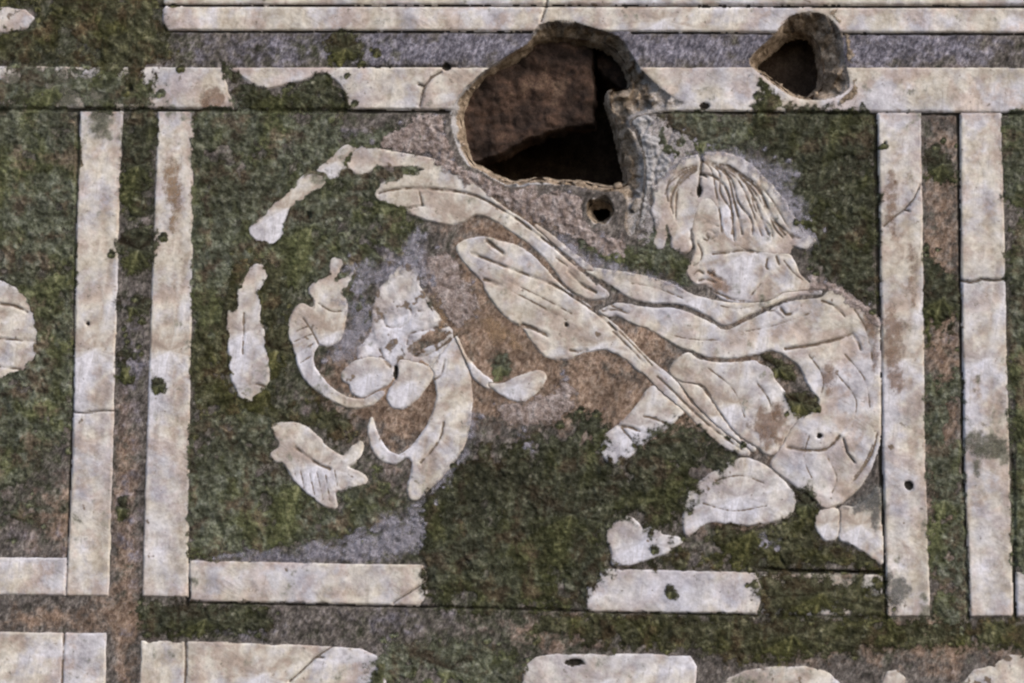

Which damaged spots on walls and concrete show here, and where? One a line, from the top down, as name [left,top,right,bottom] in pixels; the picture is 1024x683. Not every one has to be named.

spalling [369,20,826,275]
spalling [749,9,859,104]